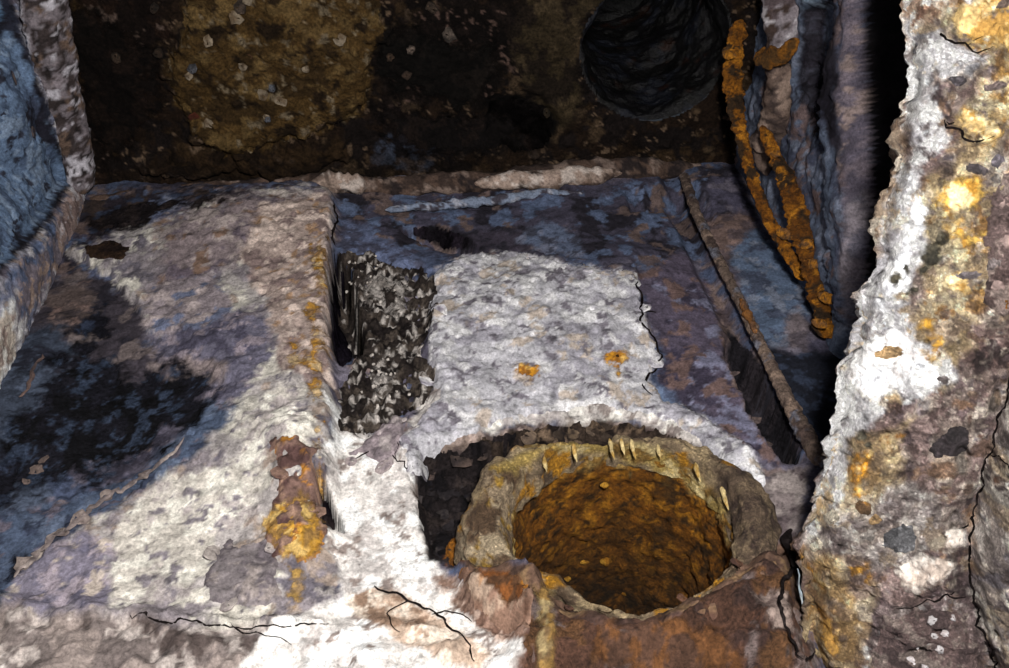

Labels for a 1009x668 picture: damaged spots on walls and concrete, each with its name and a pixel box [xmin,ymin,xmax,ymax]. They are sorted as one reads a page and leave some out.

corrosion [952,0,1009,51]
corrosion [958,108,1006,144]
corrosion [722,19,834,339]
corrosion [934,177,985,247]
leakage [64,296,117,340]
corrosion [287,236,330,401]
corrosion [262,490,321,602]
crack [896,379,1009,668]
crack [130,611,329,645]
crack [374,585,474,661]